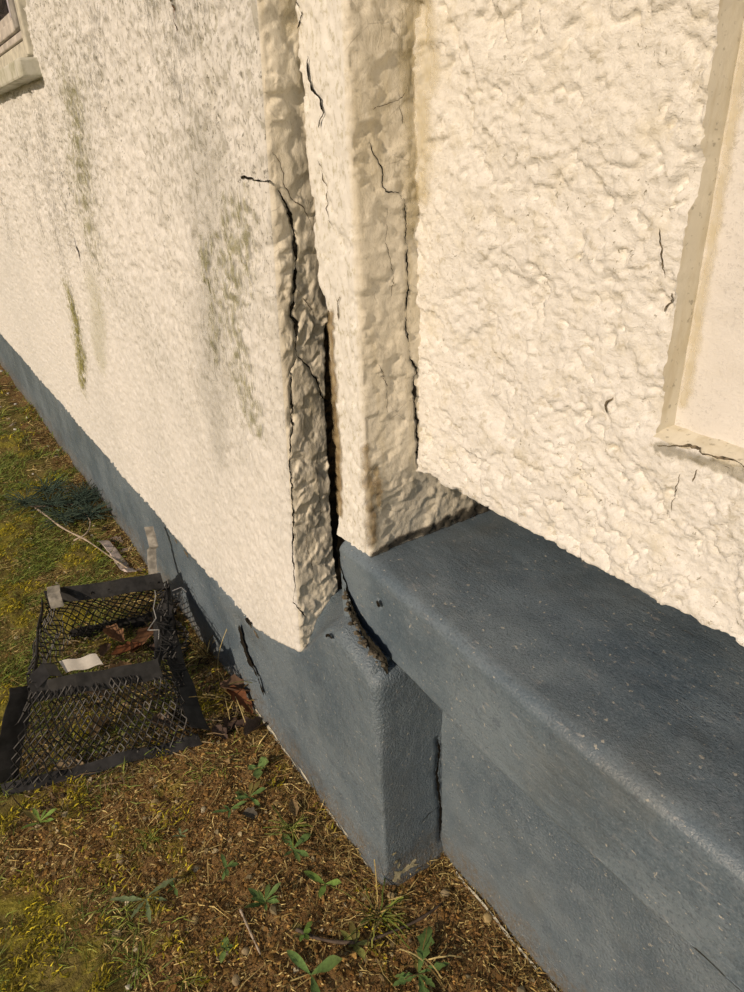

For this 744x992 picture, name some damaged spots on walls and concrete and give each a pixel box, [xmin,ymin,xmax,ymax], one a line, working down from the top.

crack [306,59,324,127]
water stain [59,80,99,269]
water stain [63,278,86,390]
water stain [200,196,262,437]
crack [370,144,419,459]
crack [238,155,388,674]
crack [657,444,744,512]
crack [238,618,264,695]
crack [422,739,442,842]